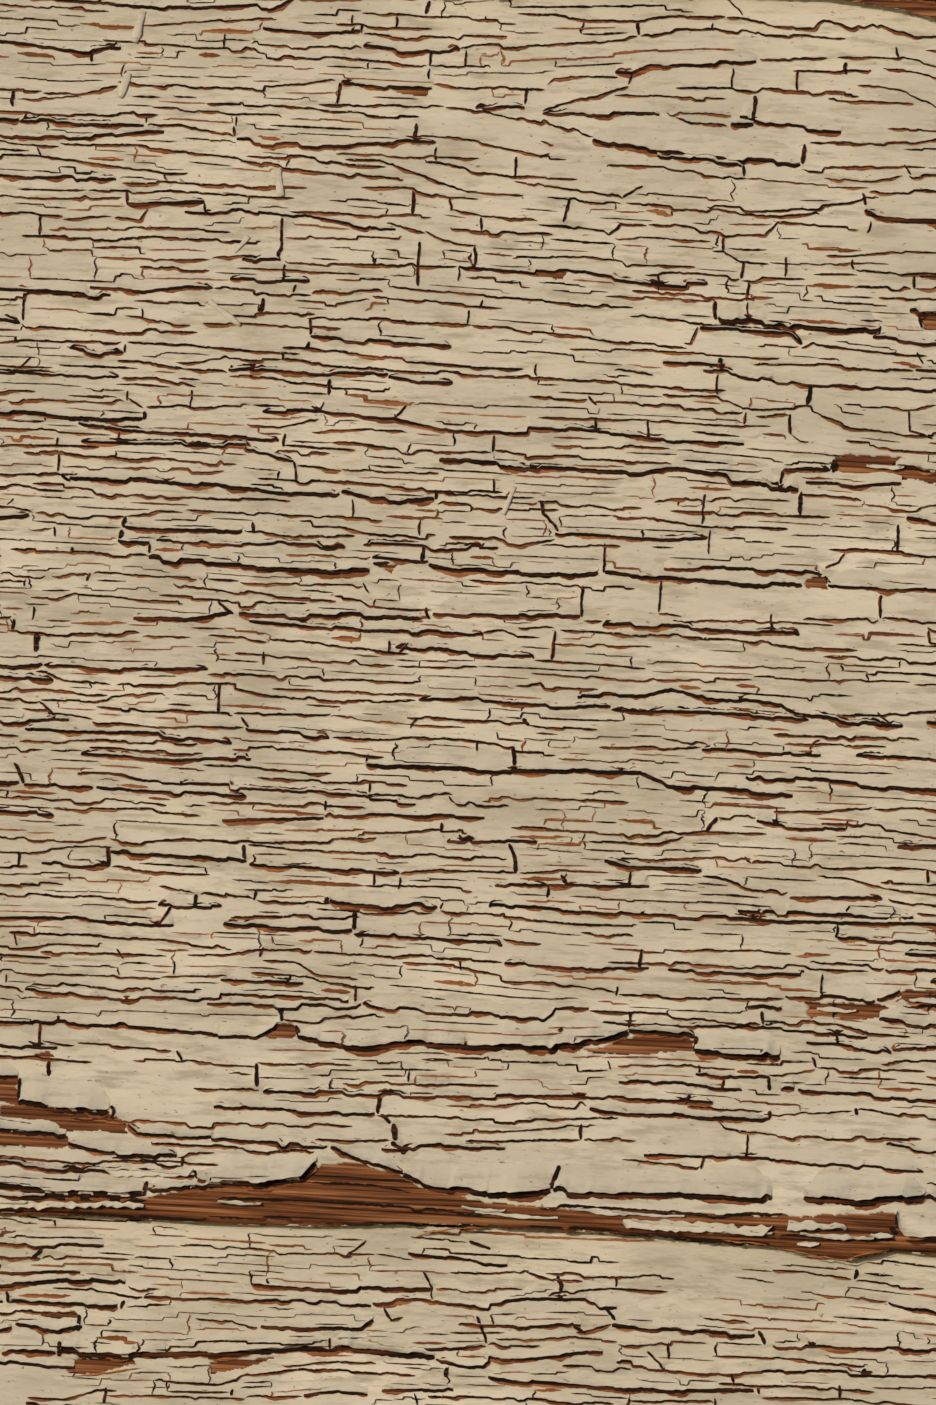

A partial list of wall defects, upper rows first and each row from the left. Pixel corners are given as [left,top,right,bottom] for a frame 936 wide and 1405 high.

peeling [848,0,936,18]
peeling [0,344,126,380]
peeling [663,299,936,394]
peeling [0,401,438,507]
peeling [228,363,936,515]
crack [0,0,936,1102]
peeling [906,510,936,526]
peeling [0,704,538,845]
peeling [897,837,936,851]
peeling [0,841,936,1399]
crack [665,1089,936,1142]
crack [0,1101,936,1405]